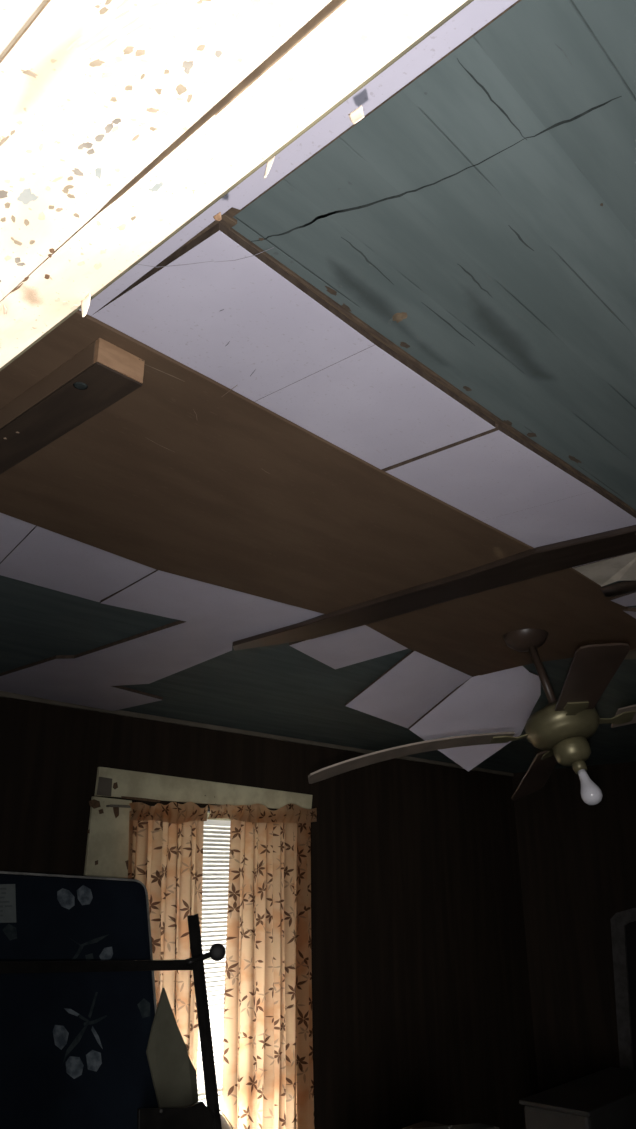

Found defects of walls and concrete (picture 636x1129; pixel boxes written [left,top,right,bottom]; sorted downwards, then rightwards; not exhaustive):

peeling [78,46,169,155]
peeling [176,45,222,103]
peeling [348,105,364,124]
peeling [0,167,120,226]
crack [251,58,622,285]
peeling [4,237,35,281]
peeling [55,292,91,317]